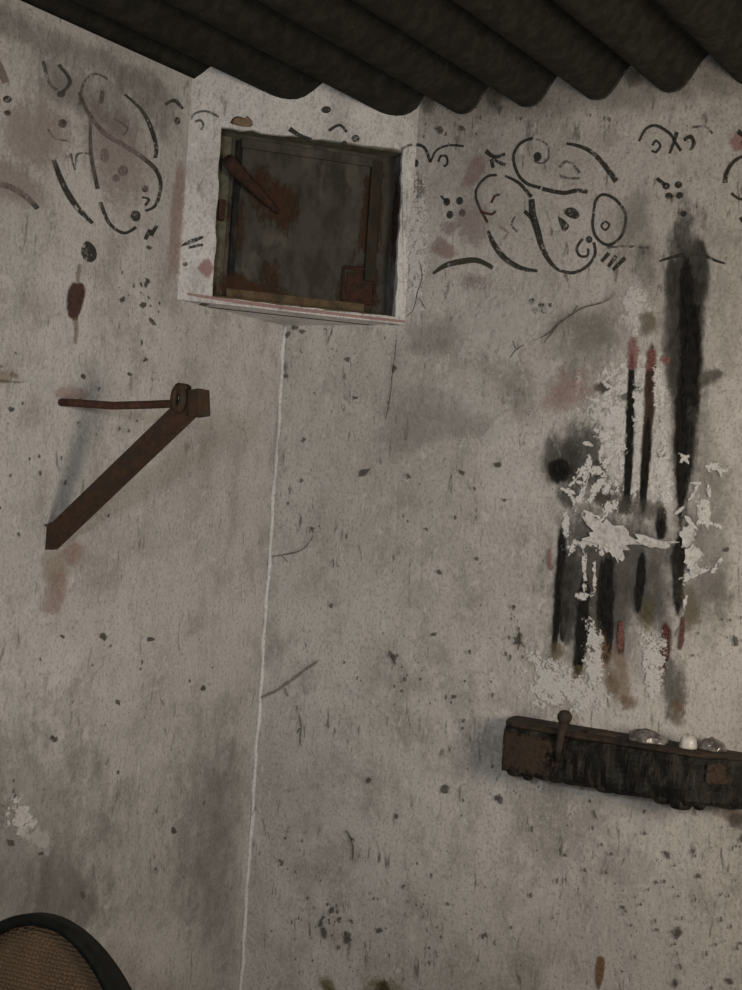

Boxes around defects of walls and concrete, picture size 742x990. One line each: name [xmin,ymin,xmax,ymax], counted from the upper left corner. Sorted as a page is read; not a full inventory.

rust [222,154,299,236]
rust [359,176,400,261]
flaking render [119,277,160,325]
rust [212,260,288,295]
water stain [698,370,722,386]
peeling [549,280,730,614]
peeling [504,617,619,719]
peeling [641,628,668,703]
peeling [2,779,49,855]
flaking render [306,897,353,949]
water stain [365,980,398,990]
flaking render [654,916,683,988]